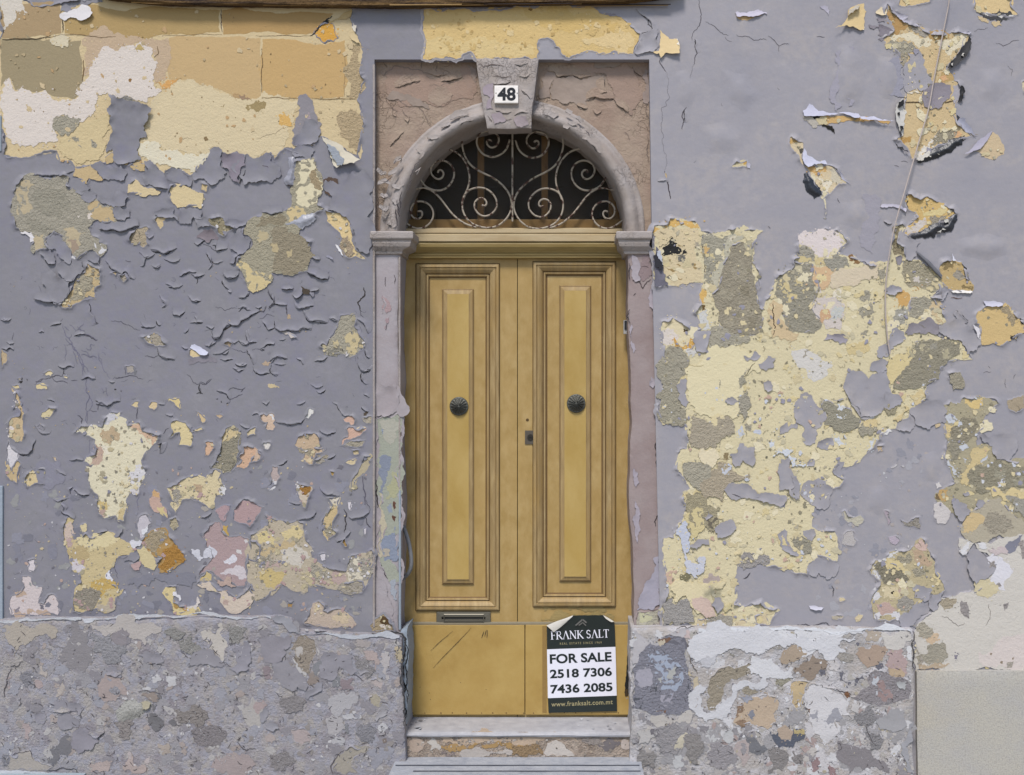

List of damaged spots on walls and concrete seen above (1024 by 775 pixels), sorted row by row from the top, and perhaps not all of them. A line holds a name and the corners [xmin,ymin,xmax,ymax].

flaking render [0,0,404,405]
peeling [427,104,473,140]
crack [379,62,529,227]
peeling [394,5,659,129]
peeling [582,134,603,153]
crack [554,2,788,199]
peeling [790,137,846,217]
peeling [825,115,890,125]
peeling [869,0,972,159]
crack [21,217,396,474]
peeling [25,367,405,681]
peeling [631,194,1024,774]